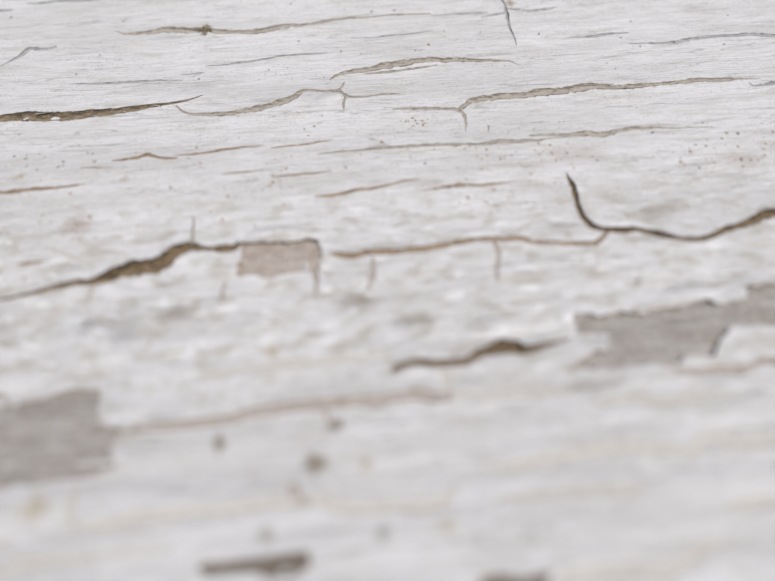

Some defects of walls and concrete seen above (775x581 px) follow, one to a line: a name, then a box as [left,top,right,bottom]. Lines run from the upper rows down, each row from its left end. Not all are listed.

crack [0,0,775,194]
crack [0,217,239,303]
peeling [236,238,322,278]
crack [311,270,319,298]
crack [315,172,775,291]
peeling [568,283,775,372]
peeling [0,388,141,488]